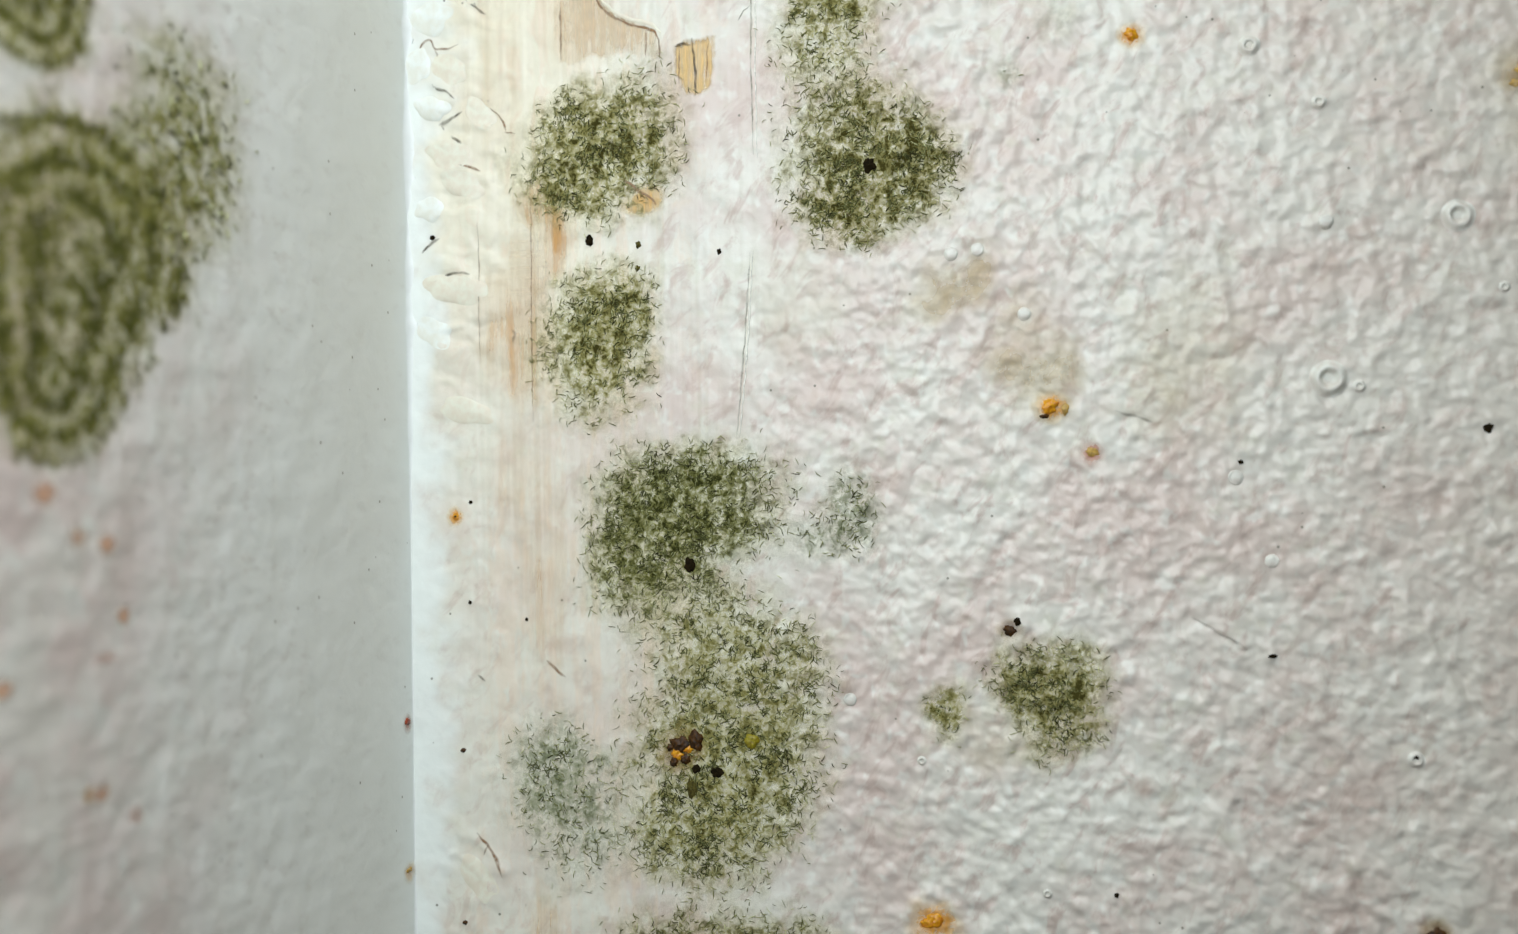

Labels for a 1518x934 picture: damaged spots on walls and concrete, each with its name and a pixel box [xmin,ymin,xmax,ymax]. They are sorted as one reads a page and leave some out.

water stain [0,0,94,73]
water stain [0,23,259,467]
peeling [559,0,712,93]
water stain [753,0,972,256]
water stain [498,51,886,934]
water stain [922,634,1121,775]